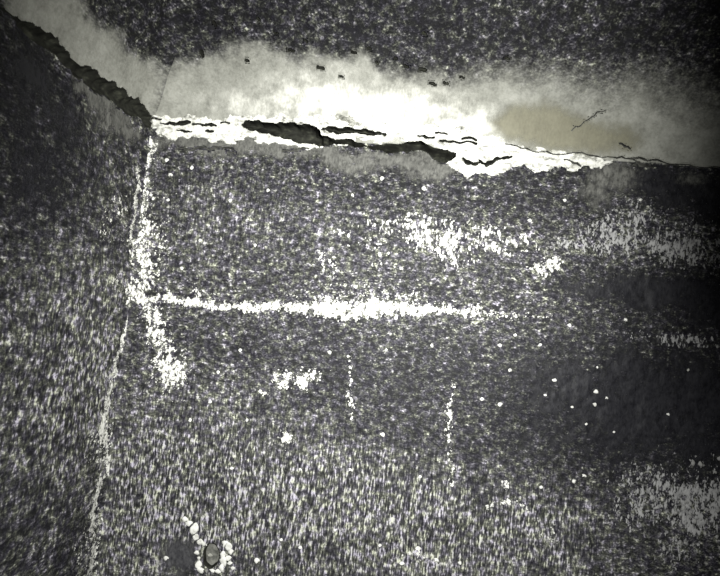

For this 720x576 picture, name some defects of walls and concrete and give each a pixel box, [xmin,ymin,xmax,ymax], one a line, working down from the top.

spalling [75,80,141,141]
spalling [153,135,453,180]
crack [0,4,720,170]
damp [100,70,637,402]
damp [625,162,720,230]
damp [509,269,720,483]